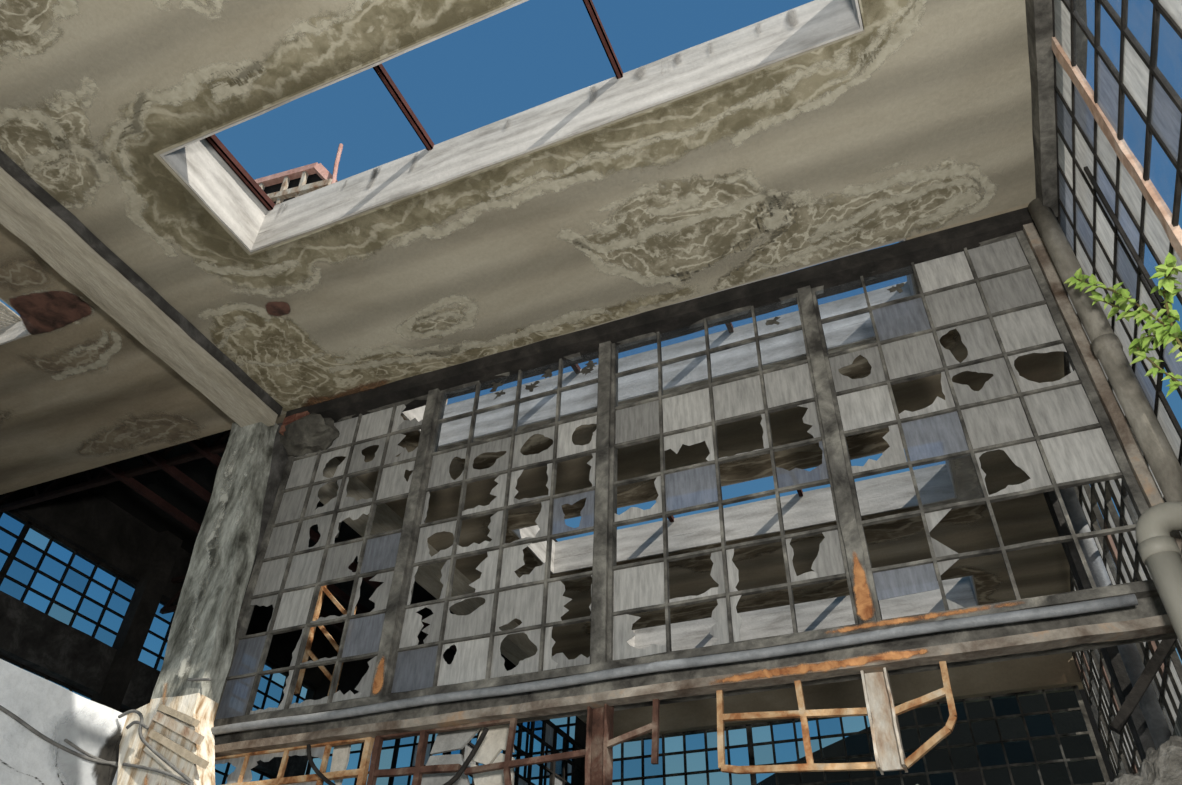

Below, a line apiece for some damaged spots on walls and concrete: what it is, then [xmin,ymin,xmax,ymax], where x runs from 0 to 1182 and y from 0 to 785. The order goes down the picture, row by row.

damp [0,0,995,412]
damp [401,415,420,447]
damp [437,408,597,470]
rust [832,554,1015,632]
rust [717,649,927,683]